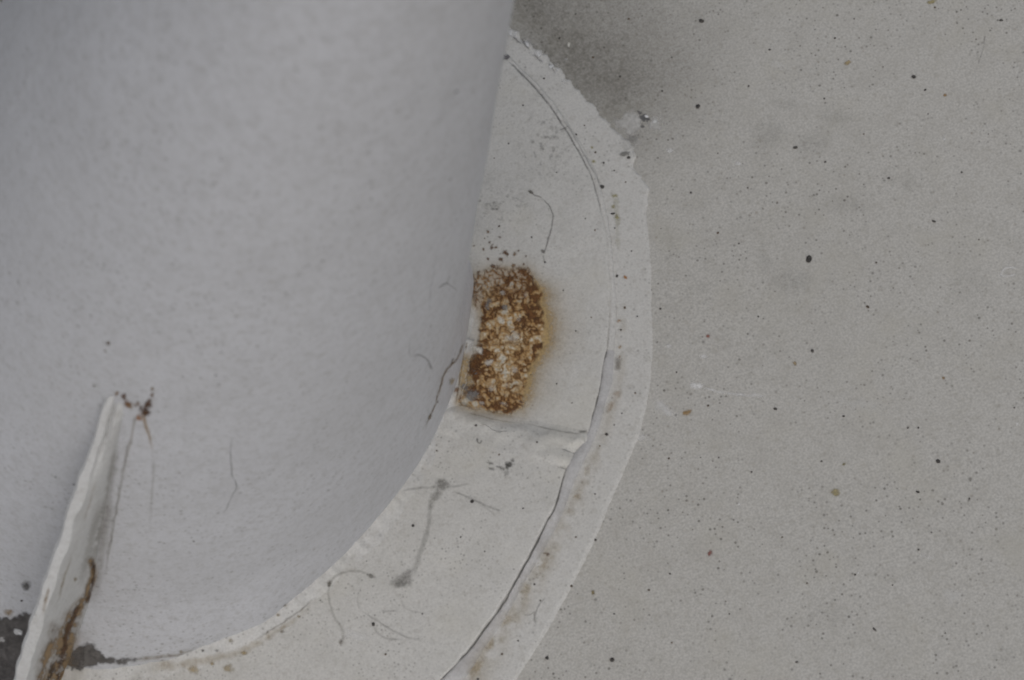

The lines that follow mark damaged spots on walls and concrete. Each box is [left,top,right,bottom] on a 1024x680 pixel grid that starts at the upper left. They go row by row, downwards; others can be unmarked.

rust [440,231,555,414]
rust [115,387,153,431]
rust [37,559,96,680]